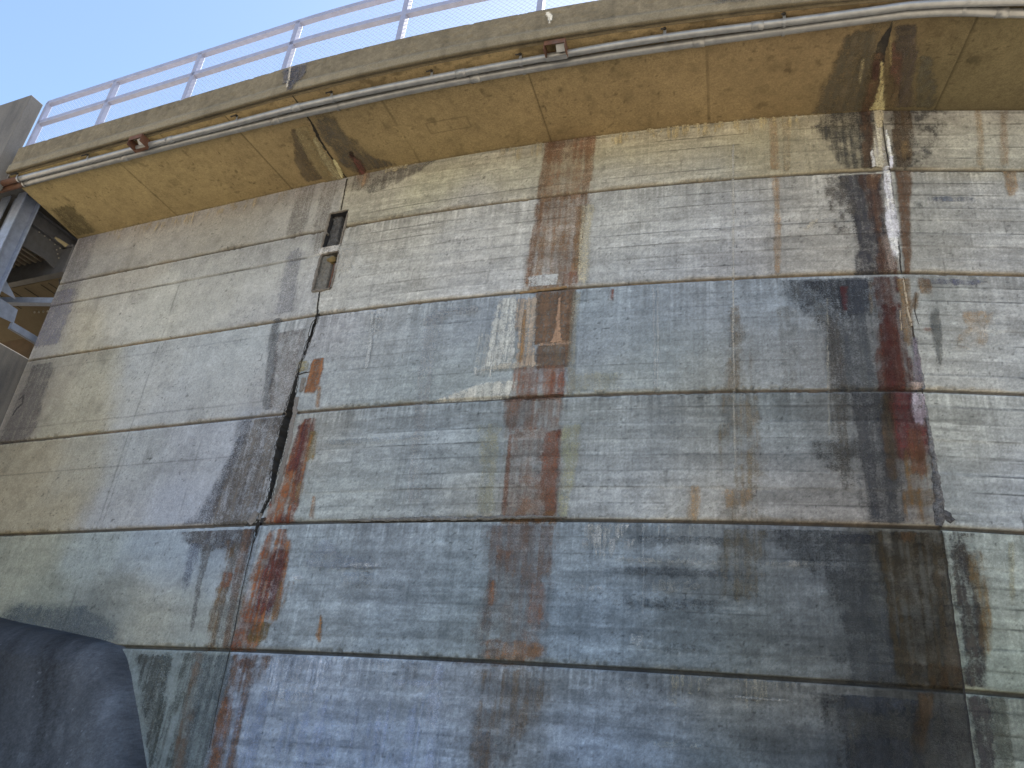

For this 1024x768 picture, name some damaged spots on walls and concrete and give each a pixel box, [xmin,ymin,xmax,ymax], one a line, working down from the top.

leakage [137,249,303,768]
corrosion [175,418,315,768]
crack [209,292,320,748]
corrosion [299,358,323,404]
leakage [289,106,434,270]
corrosion [469,136,595,768]
leakage [647,20,946,523]
crack [875,21,893,66]
leakage [773,529,1014,768]
crack [880,111,919,344]
corrosion [858,43,962,749]